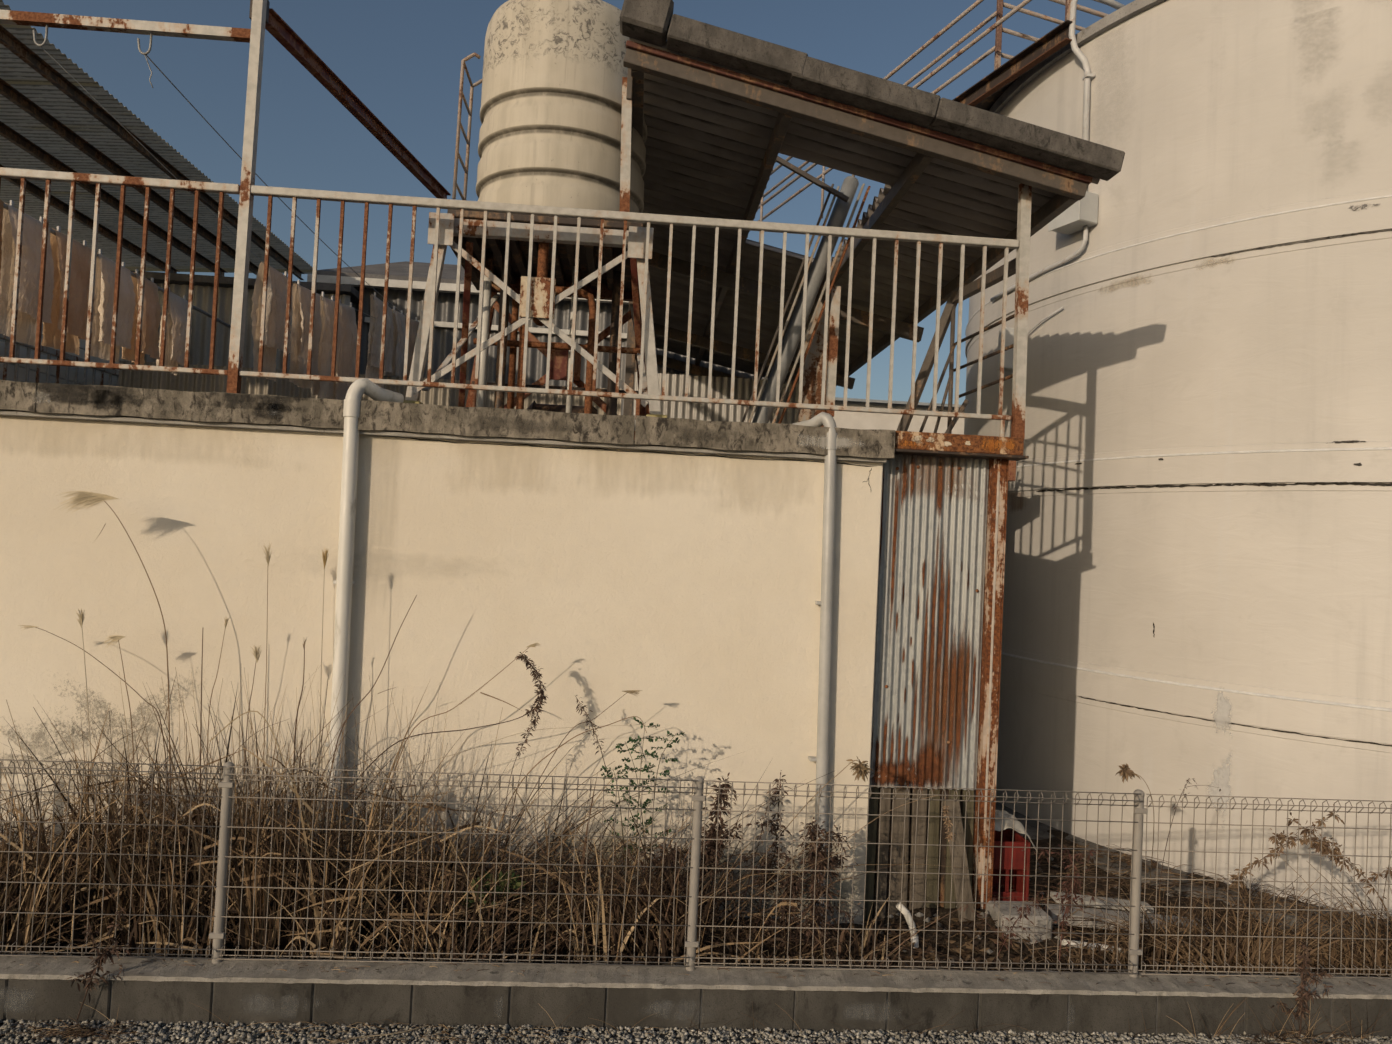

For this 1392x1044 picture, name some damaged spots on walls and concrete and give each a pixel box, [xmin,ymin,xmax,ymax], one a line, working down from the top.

crack [1209,229,1392,258]
corrosion [870,440,976,790]